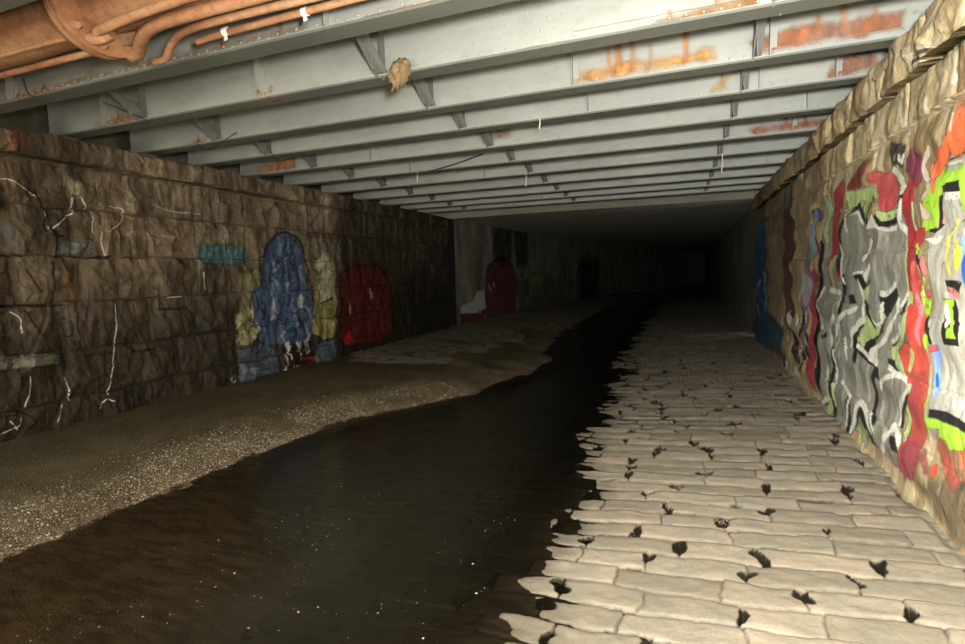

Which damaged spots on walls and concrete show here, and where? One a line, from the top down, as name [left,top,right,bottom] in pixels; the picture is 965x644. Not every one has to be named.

rust [652,0,758,25]
rust [751,13,902,50]
rust [583,32,711,81]
rust [828,52,876,78]
rust [260,158,295,173]